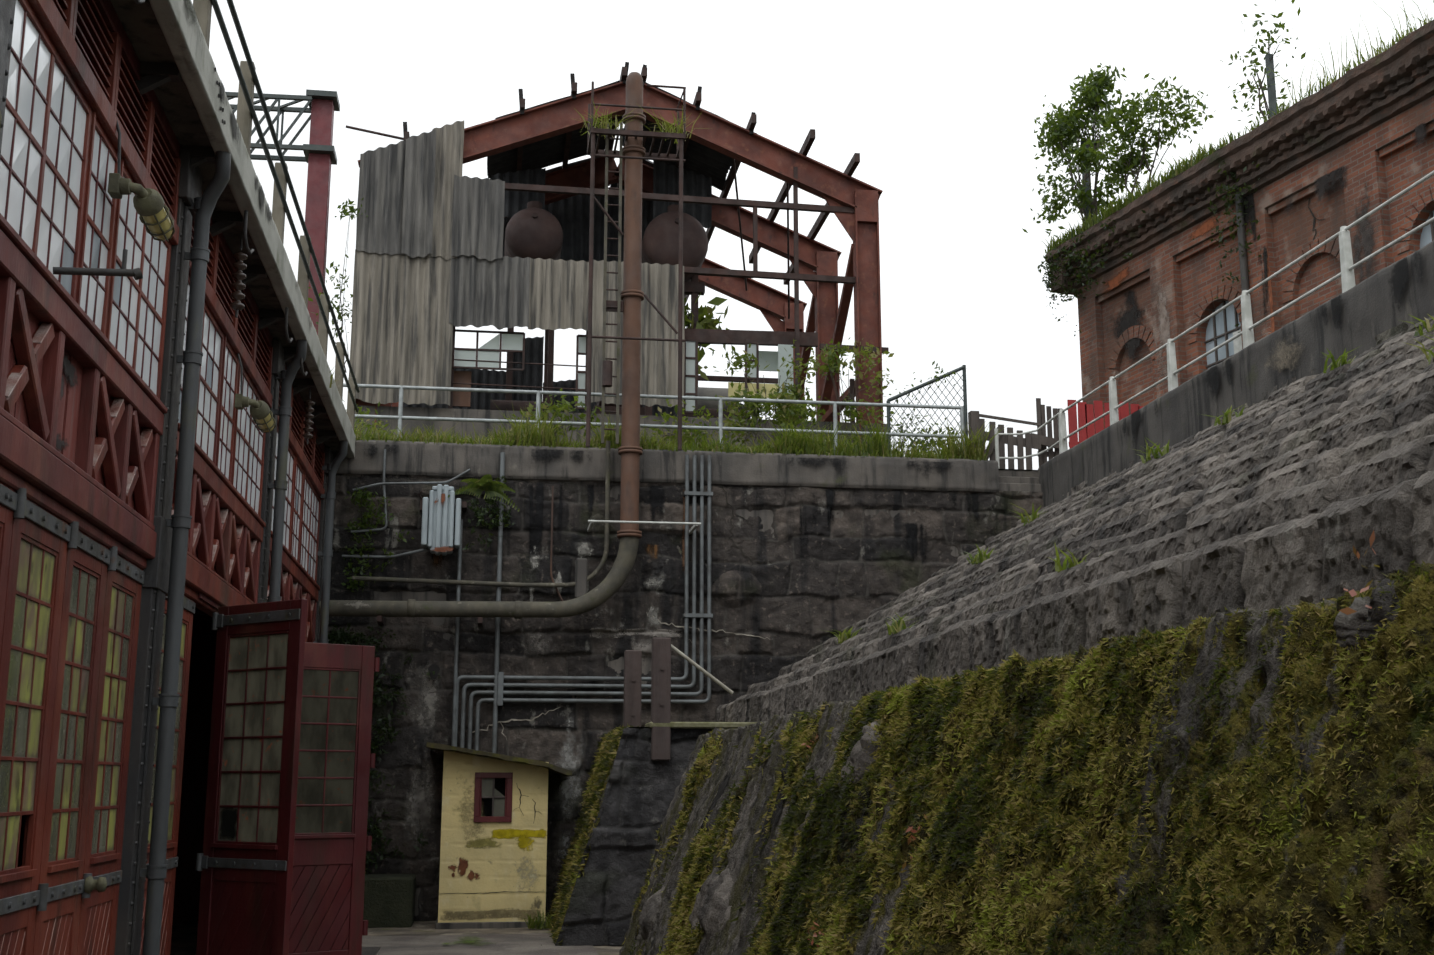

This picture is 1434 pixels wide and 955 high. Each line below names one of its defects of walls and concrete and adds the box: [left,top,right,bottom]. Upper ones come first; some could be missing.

leakage [1353,197,1376,283]
leakage [1389,251,1423,309]
leakage [1115,291,1145,360]
peeling [448,858,480,881]